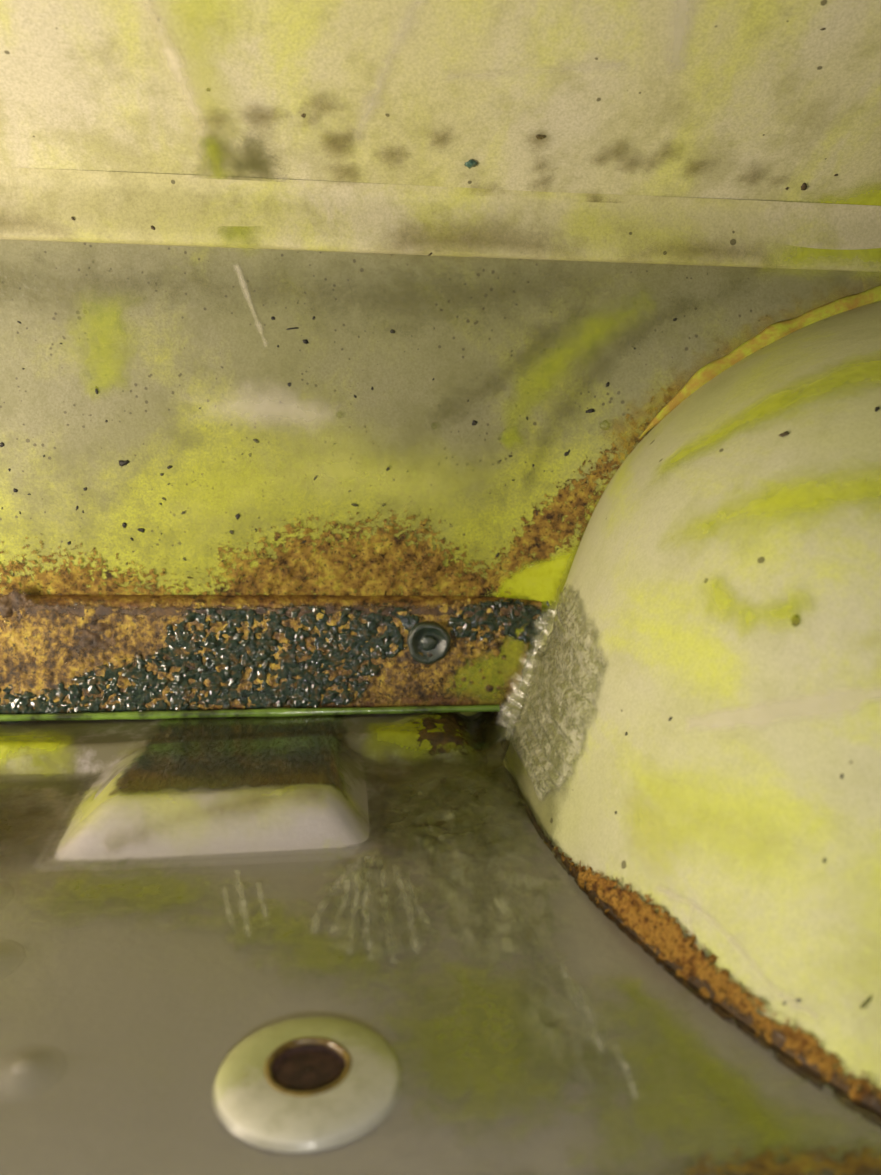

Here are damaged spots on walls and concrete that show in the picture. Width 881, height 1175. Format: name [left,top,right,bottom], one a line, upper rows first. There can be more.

rust [0,383,686,713]
rust [500,755,881,1127]